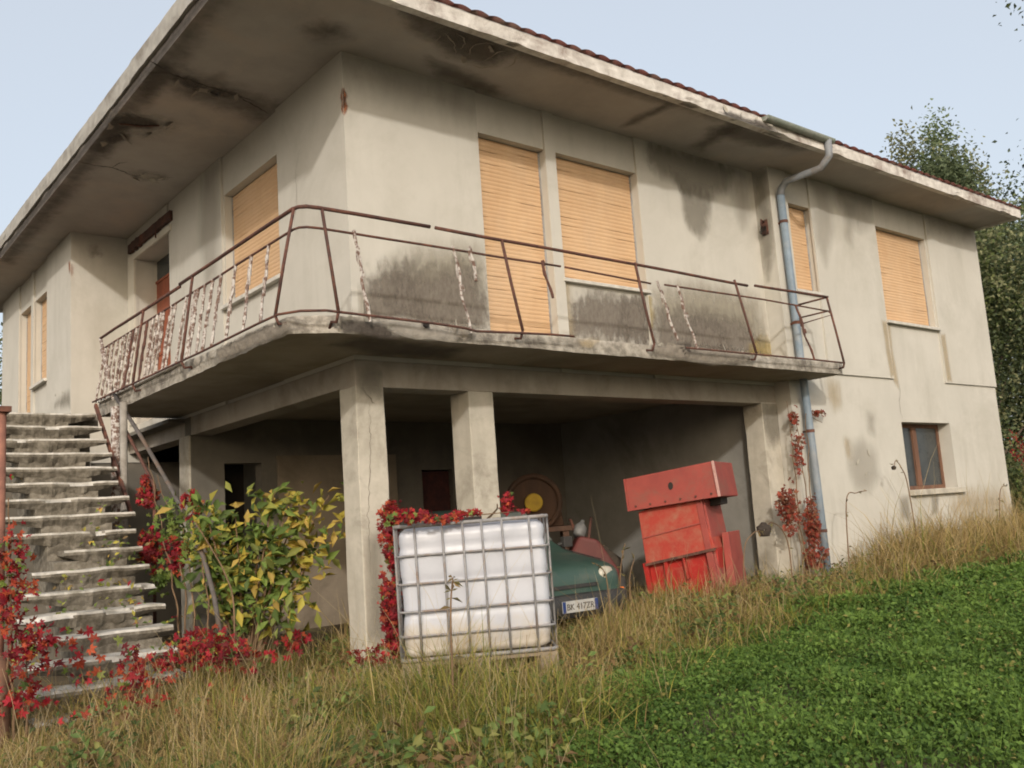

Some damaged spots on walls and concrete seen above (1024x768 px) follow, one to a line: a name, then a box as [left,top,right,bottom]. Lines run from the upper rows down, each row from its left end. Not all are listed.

spalling [100,113,173,147]
damp [650,146,727,233]
damp [757,173,771,267]
damp [363,257,489,330]
damp [570,291,764,354]